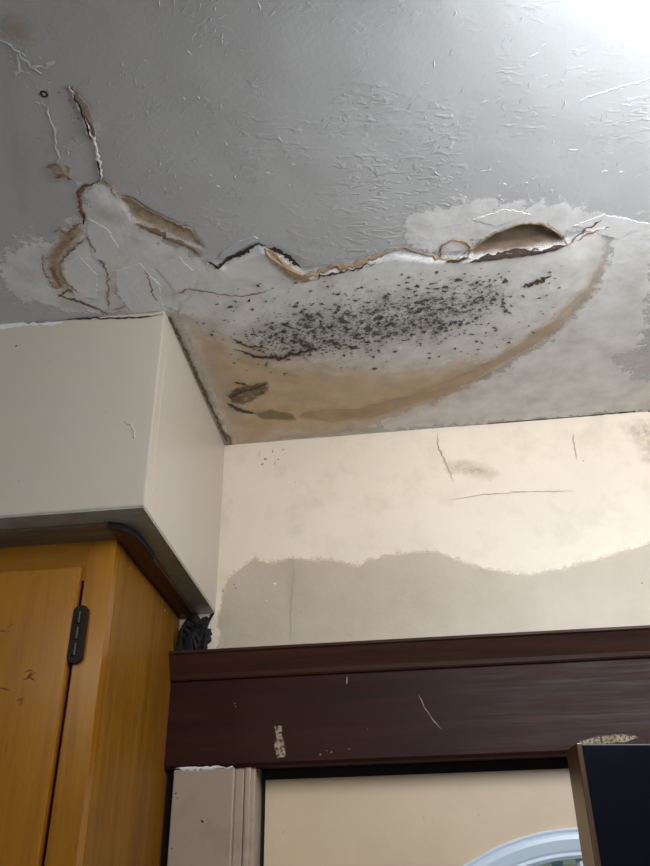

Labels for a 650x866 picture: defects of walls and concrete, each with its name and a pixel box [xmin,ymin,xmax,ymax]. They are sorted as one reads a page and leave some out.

peeling [0,321,63,330]
peeling [0,181,217,317]
crack [0,40,471,445]
damp [189,268,588,466]
peeling [363,195,650,432]